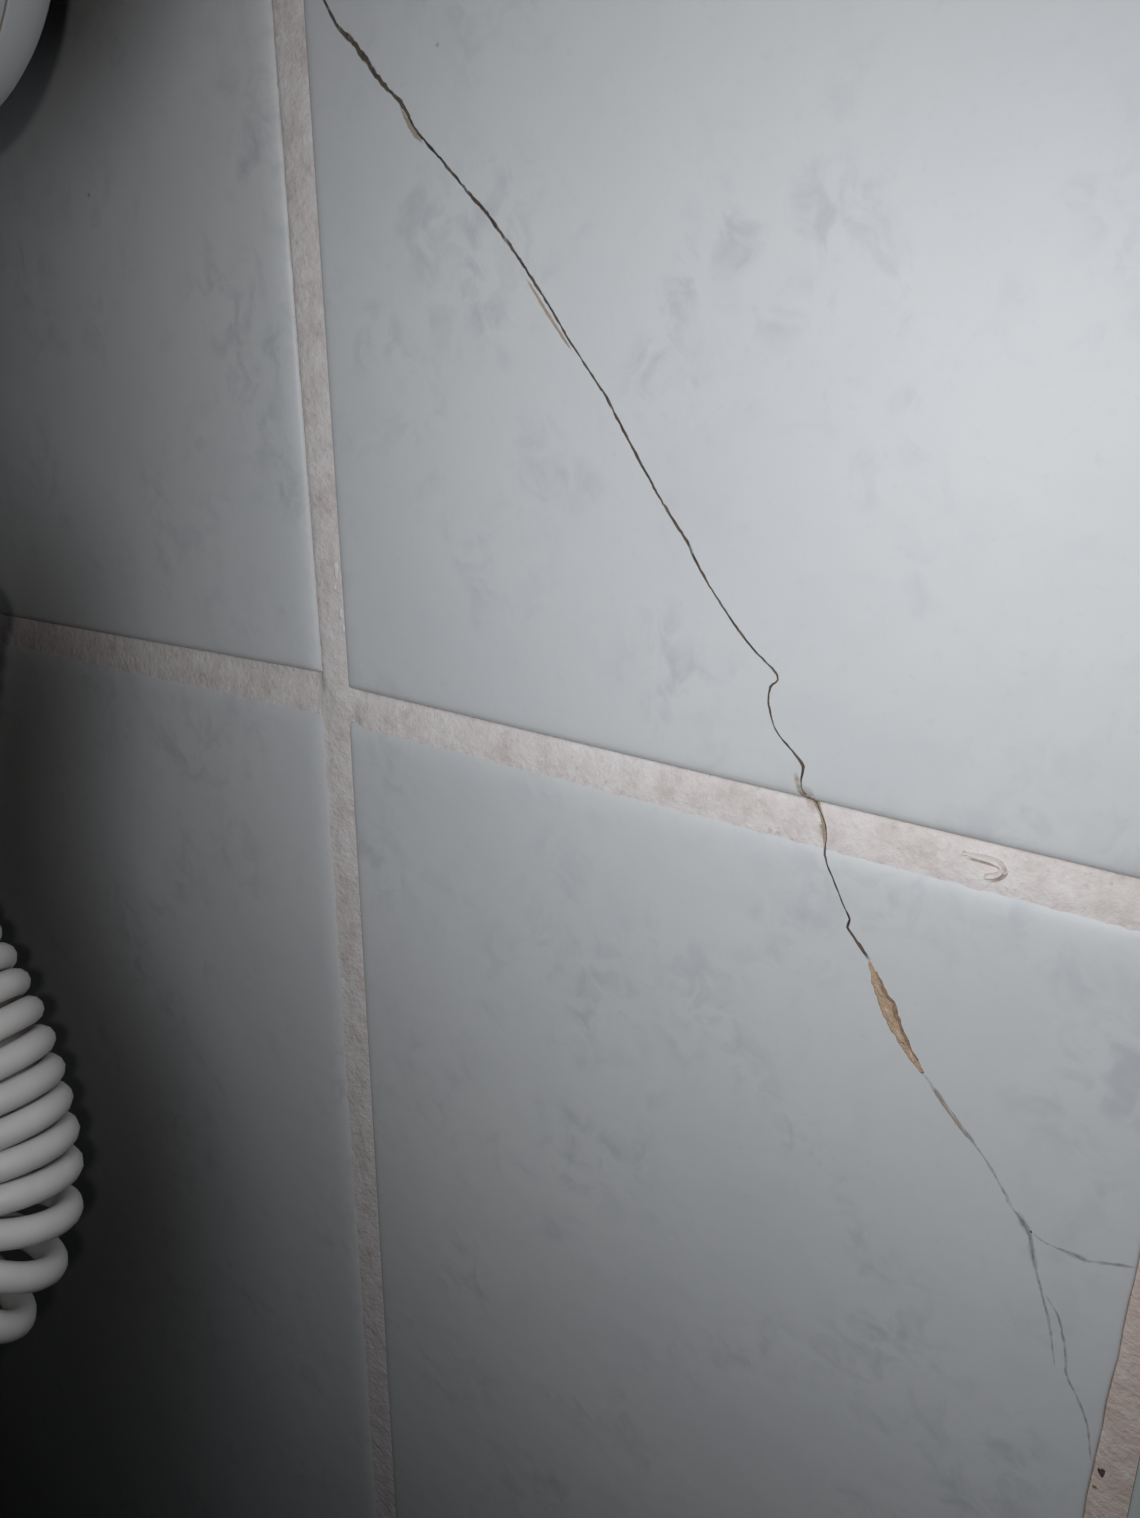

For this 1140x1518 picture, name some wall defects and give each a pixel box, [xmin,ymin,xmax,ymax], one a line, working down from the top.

crack [323,0,867,957]
crack [935,1092,963,1131]